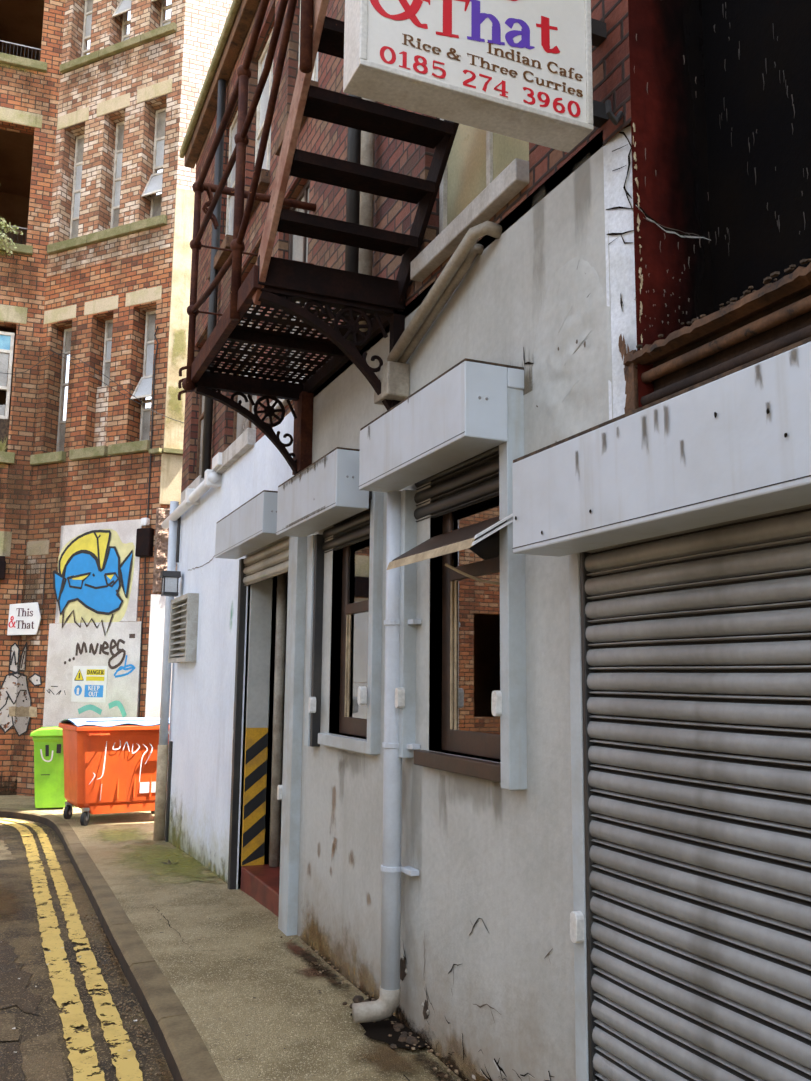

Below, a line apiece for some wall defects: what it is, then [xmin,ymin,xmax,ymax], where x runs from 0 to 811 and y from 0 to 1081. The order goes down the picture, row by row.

peeling [618,123,643,412]
water stain [287,919,380,1000]
crack [424,948,554,1081]